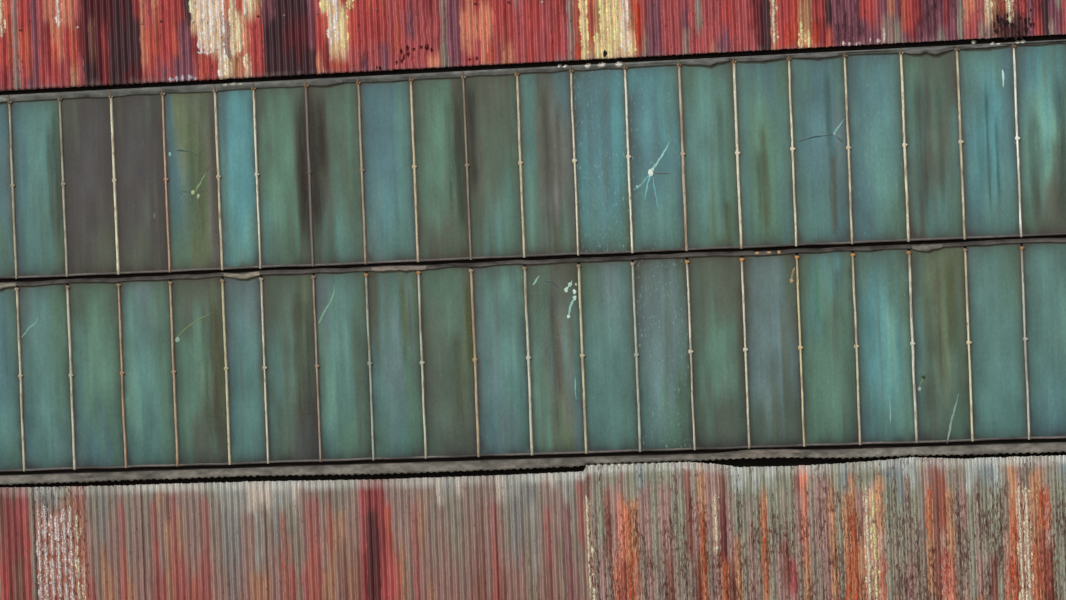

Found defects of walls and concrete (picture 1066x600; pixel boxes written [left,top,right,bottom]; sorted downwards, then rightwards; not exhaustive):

peeling [187,0,255,77]
rust [395,44,433,65]
peeling [577,0,637,59]
rust [993,9,1035,40]
crack [634,143,671,206]
peeling [36,505,86,600]
rust [1005,502,1019,600]